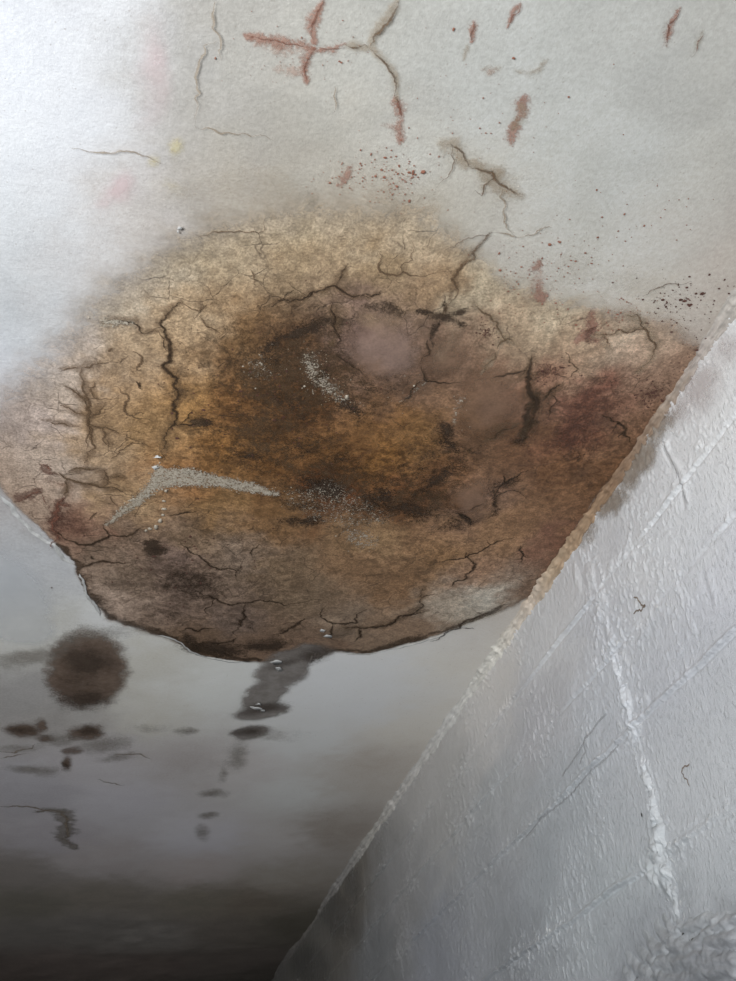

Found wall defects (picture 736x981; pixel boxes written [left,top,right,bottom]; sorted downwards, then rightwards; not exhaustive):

corrosion [233,1,371,84]
corrosion [499,95,529,147]
crack [266,146,578,439]
crack [596,283,686,372]
crack [14,302,218,568]
water stain [0,206,699,742]
crack [456,472,525,525]
crack [603,416,630,441]
crack [181,541,528,644]
water stain [61,726,119,769]